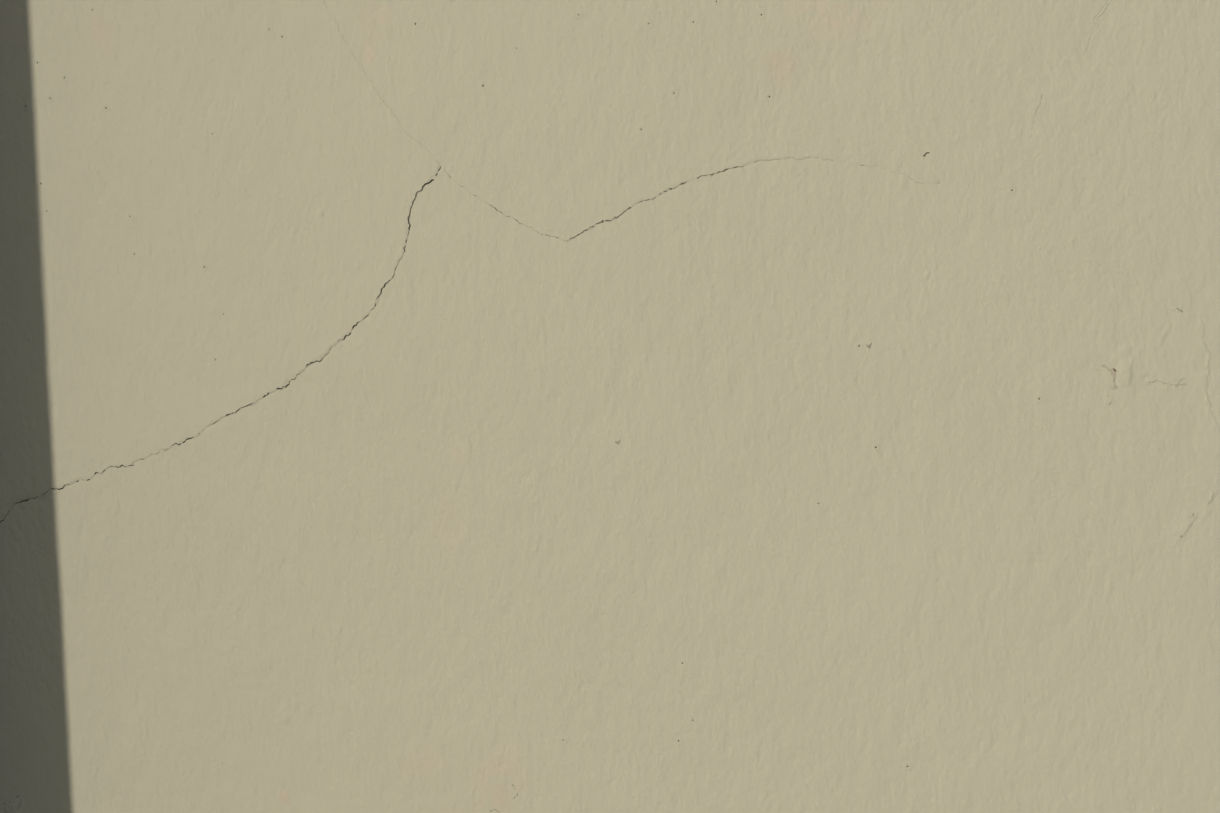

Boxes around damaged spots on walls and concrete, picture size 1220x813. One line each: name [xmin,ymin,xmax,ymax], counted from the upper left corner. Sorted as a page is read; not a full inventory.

crack [0,2,940,522]